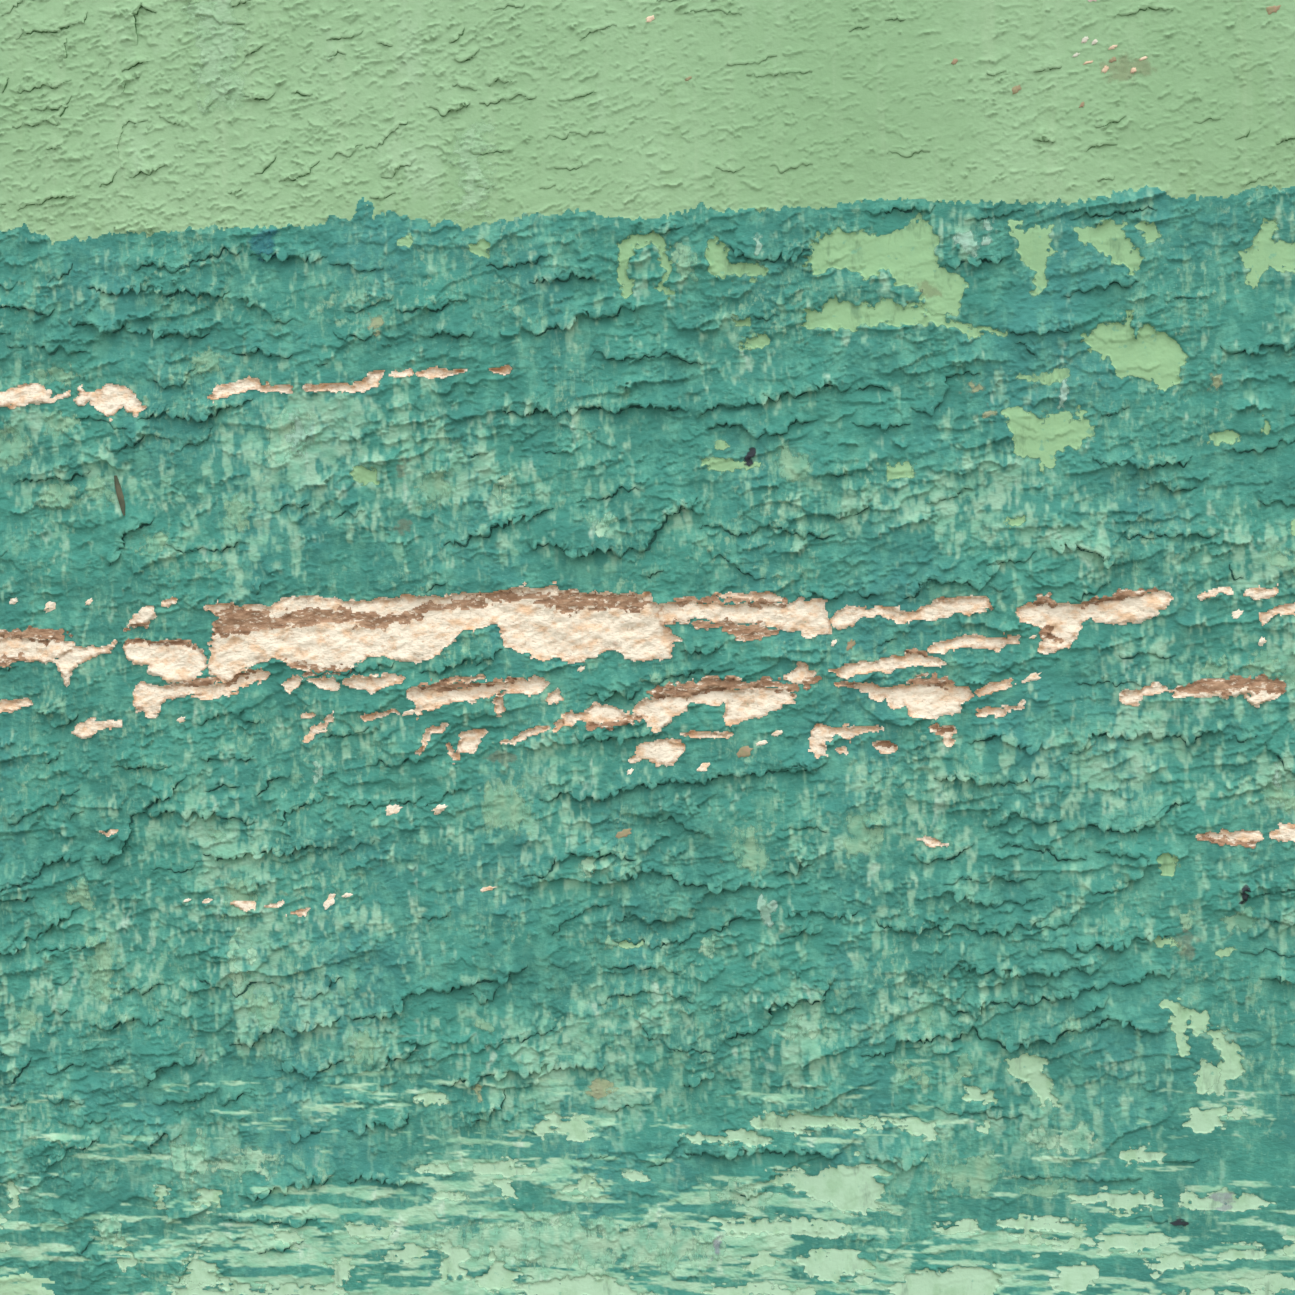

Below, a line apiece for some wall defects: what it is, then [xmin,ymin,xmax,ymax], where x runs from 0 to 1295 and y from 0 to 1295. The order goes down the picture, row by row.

peeling [87,242,383,324]
peeling [520,199,1189,392]
peeling [527,481,835,560]
peeling [886,461,914,482]
spalling [0,538,1176,835]
spalling [1075,545,1295,708]
peeling [0,757,290,902]
peeling [999,794,1195,895]
peeling [1067,726,1295,849]
peeling [0,878,165,1031]
peeling [141,827,1295,1295]
peeling [76,1215,146,1278]